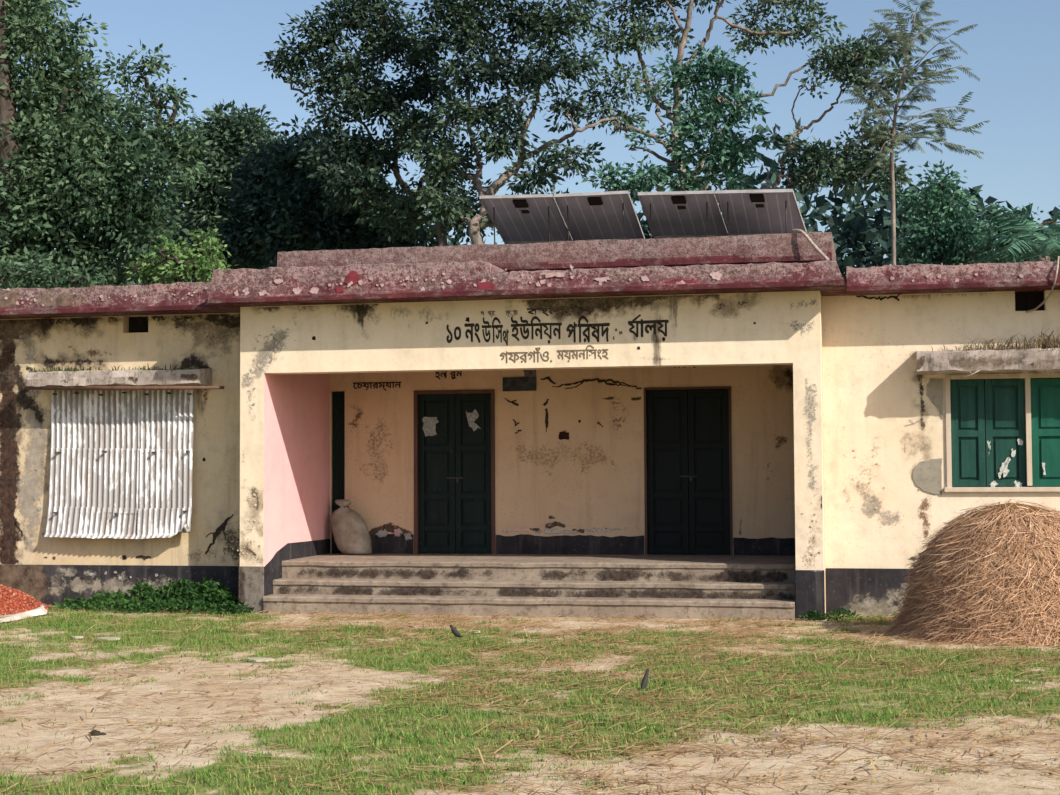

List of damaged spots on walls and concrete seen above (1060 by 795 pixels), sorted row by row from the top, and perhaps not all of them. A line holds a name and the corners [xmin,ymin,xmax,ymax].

peeling [234,271,387,296]
peeling [400,273,495,291]
peeling [517,265,574,287]
water stain [523,294,720,319]
water stain [151,313,240,346]
water stain [181,354,209,369]
crack [505,376,642,434]
water stain [804,380,817,489]
water stain [0,317,117,601]
peeling [990,439,1023,487]
peeling [18,390,170,596]
crack [205,514,233,554]